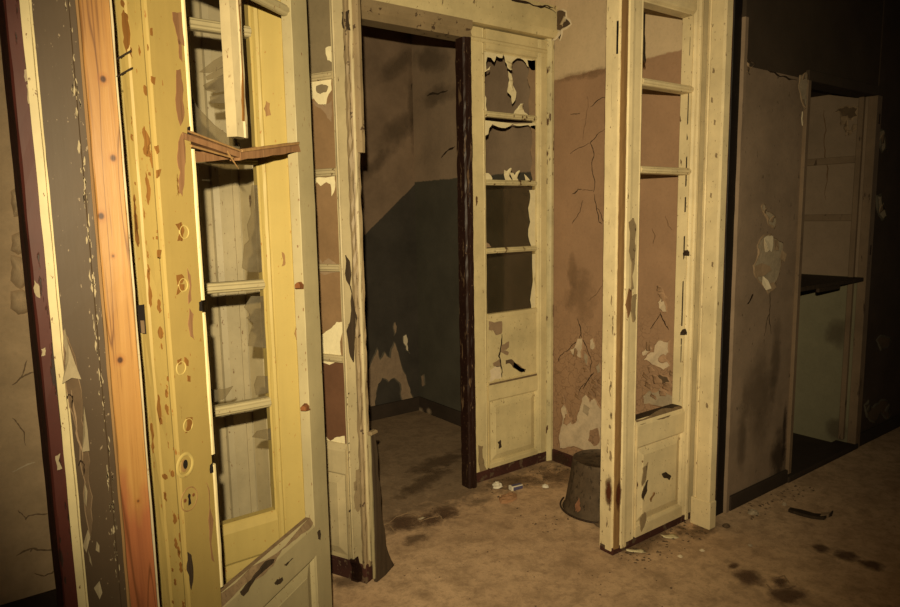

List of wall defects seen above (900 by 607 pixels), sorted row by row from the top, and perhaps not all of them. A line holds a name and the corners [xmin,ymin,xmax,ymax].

crack [570,97,605,224]
peeling [753,203,787,294]
crack [12,361,34,385]
spalling [367,322,425,407]
crack [558,319,593,391]
spalling [558,337,602,450]
peeling [642,339,673,407]